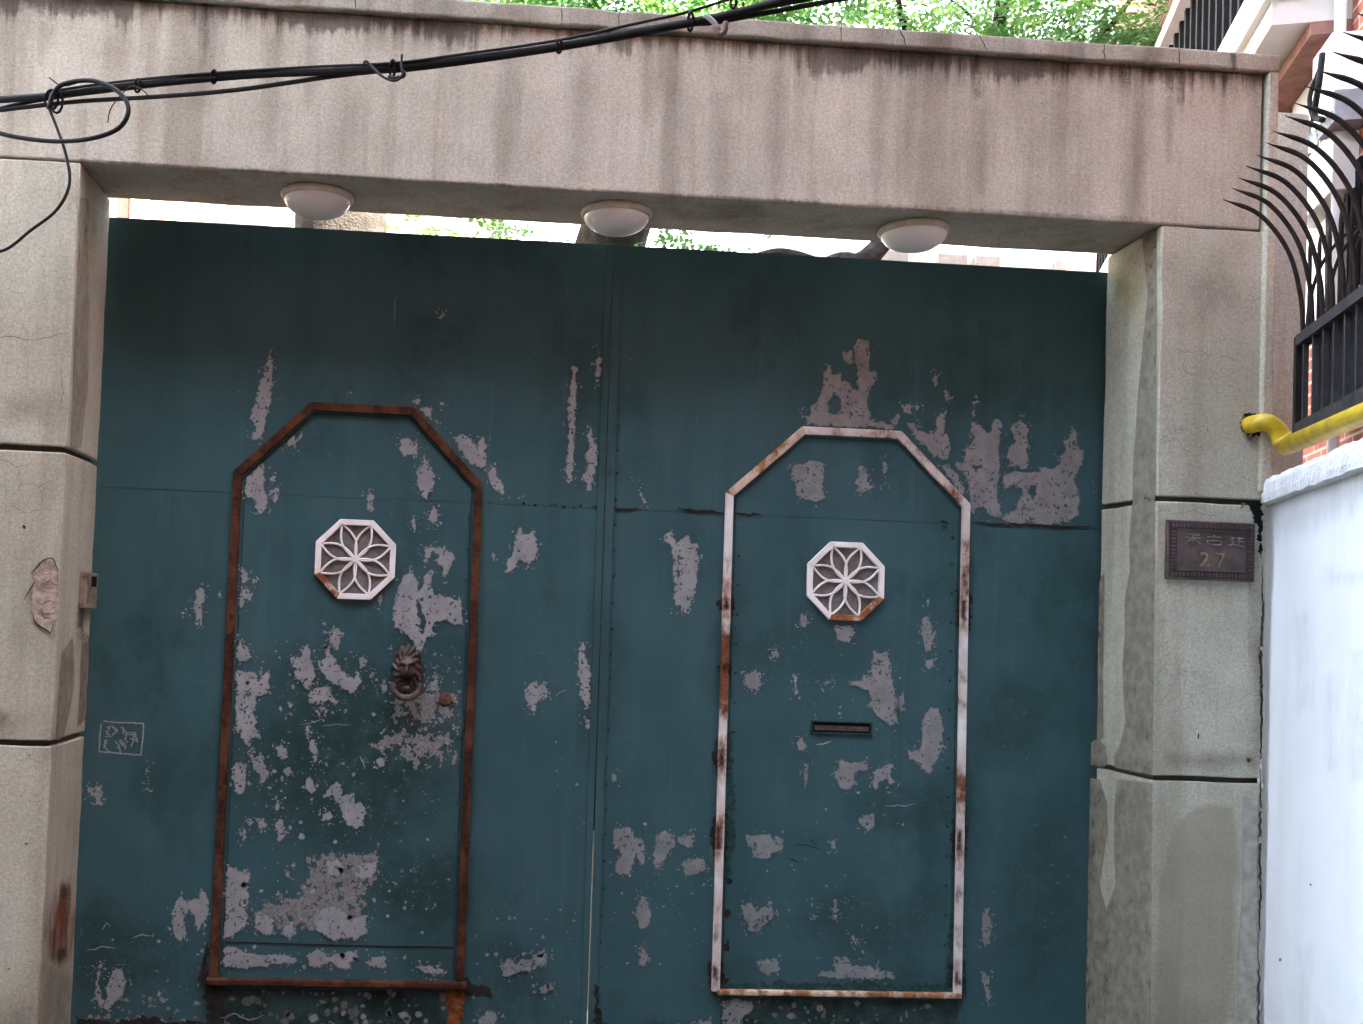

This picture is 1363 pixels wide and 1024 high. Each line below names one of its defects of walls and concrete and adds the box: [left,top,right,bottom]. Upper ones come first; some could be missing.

peeling [561,345,603,495]
peeling [798,338,1097,529]
peeling [659,527,703,620]
rust [716,583,735,618]
rust [955,572,973,631]
peeling [83,431,468,1024]
peeling [788,649,906,740]
peeling [609,822,713,971]
rust [709,722,737,884]
rust [707,913,968,1004]
peeling [736,703,947,985]
rust [950,816,969,862]